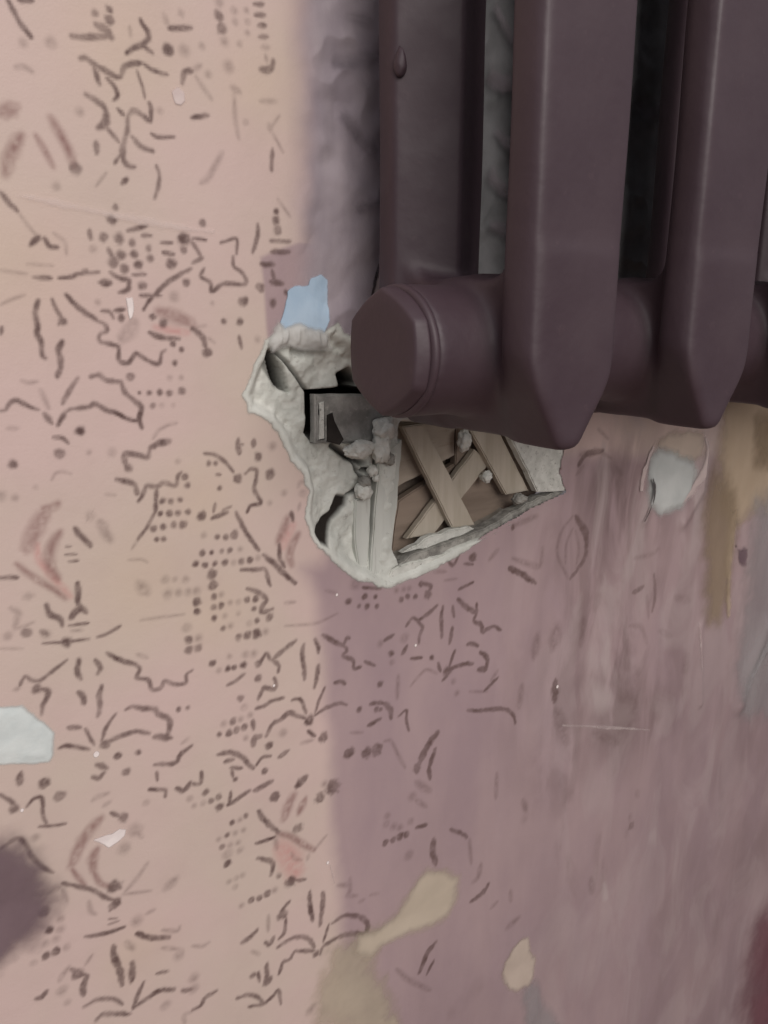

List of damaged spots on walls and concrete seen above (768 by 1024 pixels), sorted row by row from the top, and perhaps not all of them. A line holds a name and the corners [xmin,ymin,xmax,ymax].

spalling [242,275,566,588]
flaking render [640,432,709,521]
peeling [0,706,54,764]